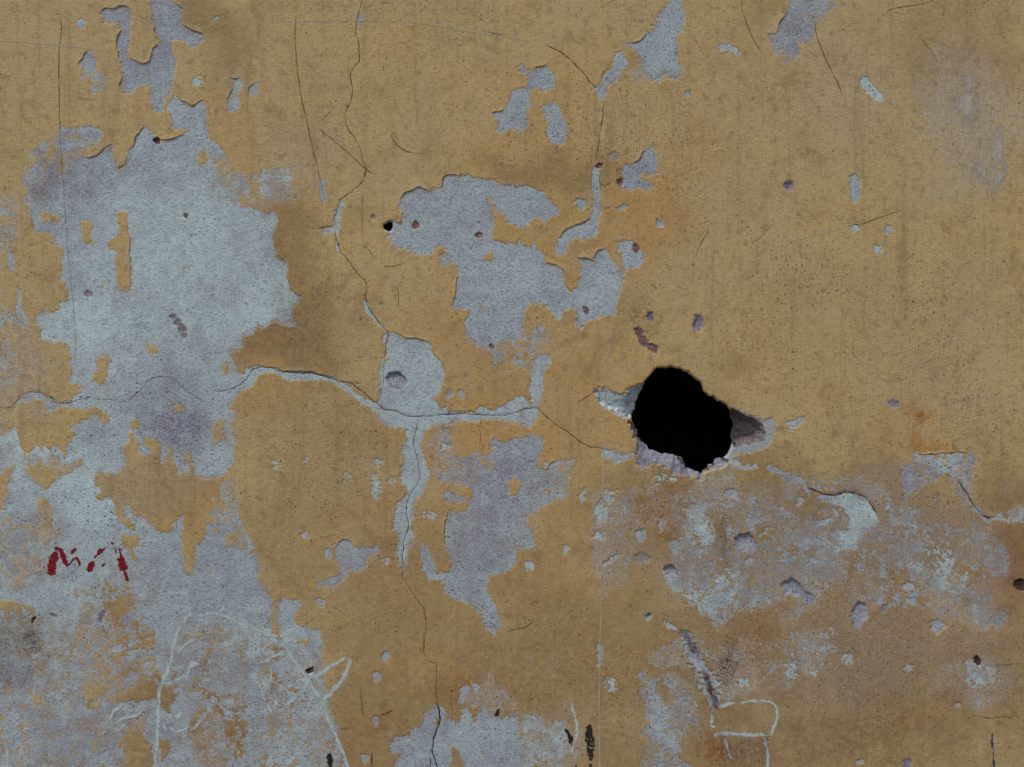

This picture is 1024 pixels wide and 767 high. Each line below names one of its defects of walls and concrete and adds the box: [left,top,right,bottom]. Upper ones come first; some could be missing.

peeling [595,0,685,99]
peeling [718,43,740,56]
peeling [768,0,839,63]
crack [0,0,613,767]
peeling [0,0,659,767]
peeling [579,384,1024,635]
crack [809,488,877,513]
crack [958,481,994,520]